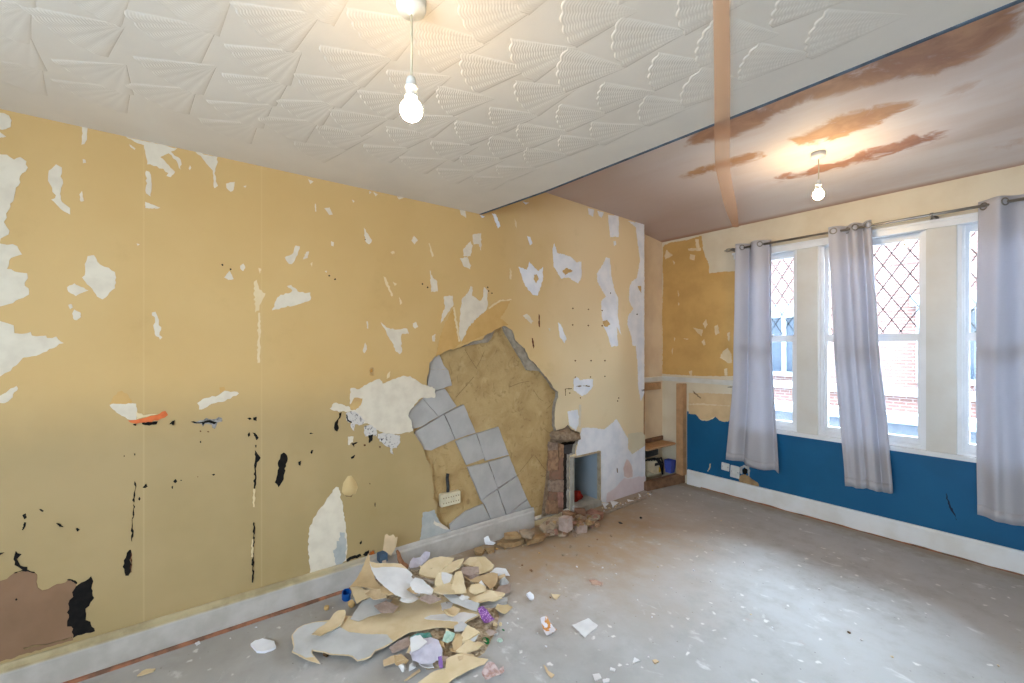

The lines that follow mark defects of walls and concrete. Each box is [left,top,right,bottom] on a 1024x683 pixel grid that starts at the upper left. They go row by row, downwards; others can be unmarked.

damp [679,2,1024,148]
peeling [0,113,12,138]
damp [676,148,770,182]
damp [765,128,956,184]
peeling [0,154,29,306]
peeling [67,255,116,320]
peeling [588,208,645,400]
peeling [0,321,63,376]
peeling [0,386,18,403]
flaking render [330,322,646,540]
flaking render [308,487,347,573]
flaking render [0,552,95,662]